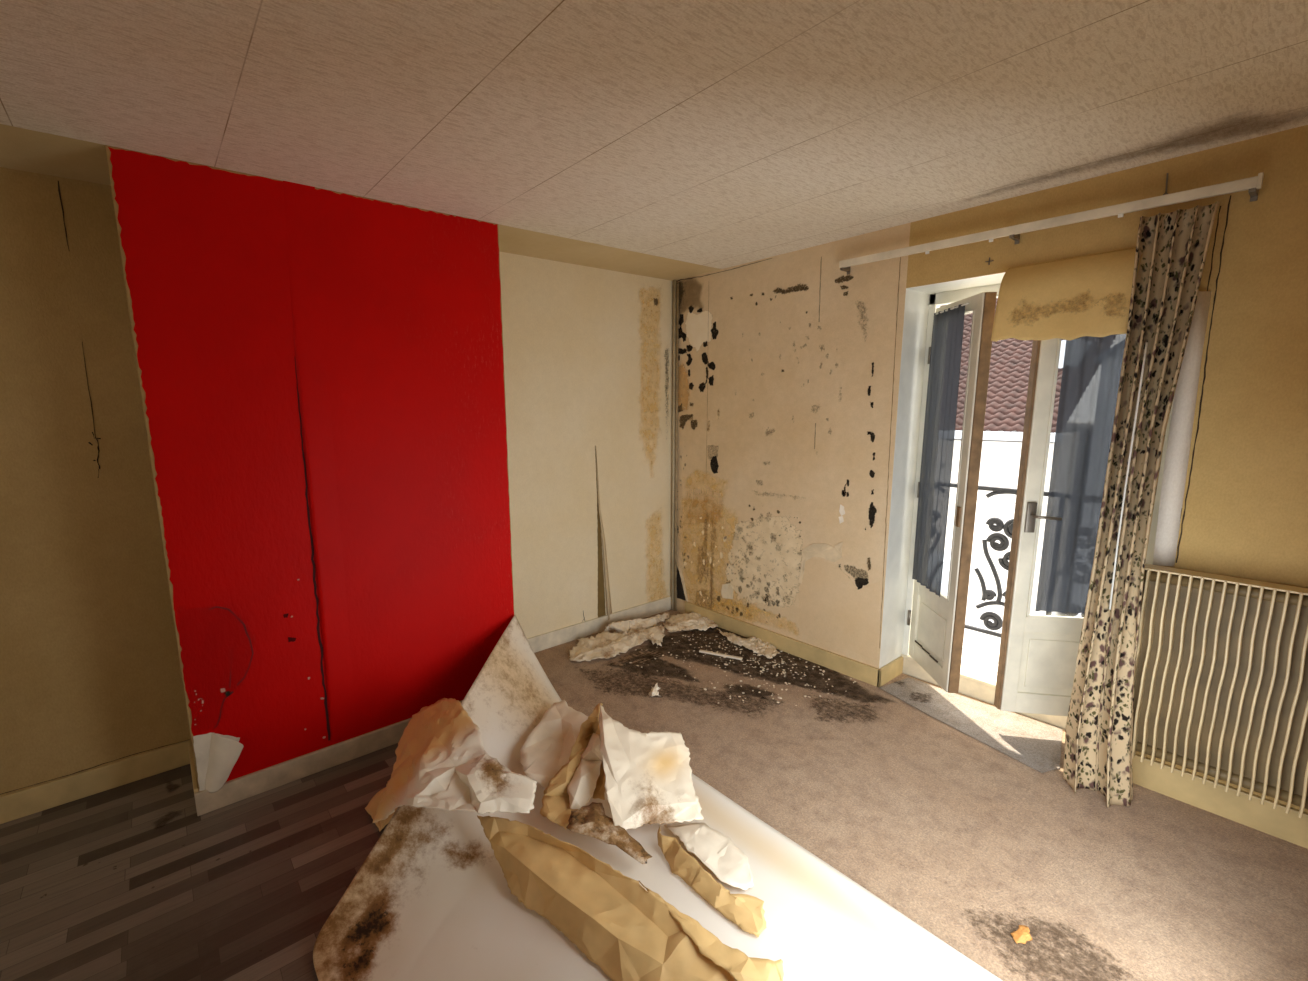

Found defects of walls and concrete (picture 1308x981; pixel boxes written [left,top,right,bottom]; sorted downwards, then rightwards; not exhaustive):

crack [58,181,69,249]
crack [82,342,96,438]
damp [677,514,780,618]
damp [839,558,871,590]
damp [576,626,889,723]